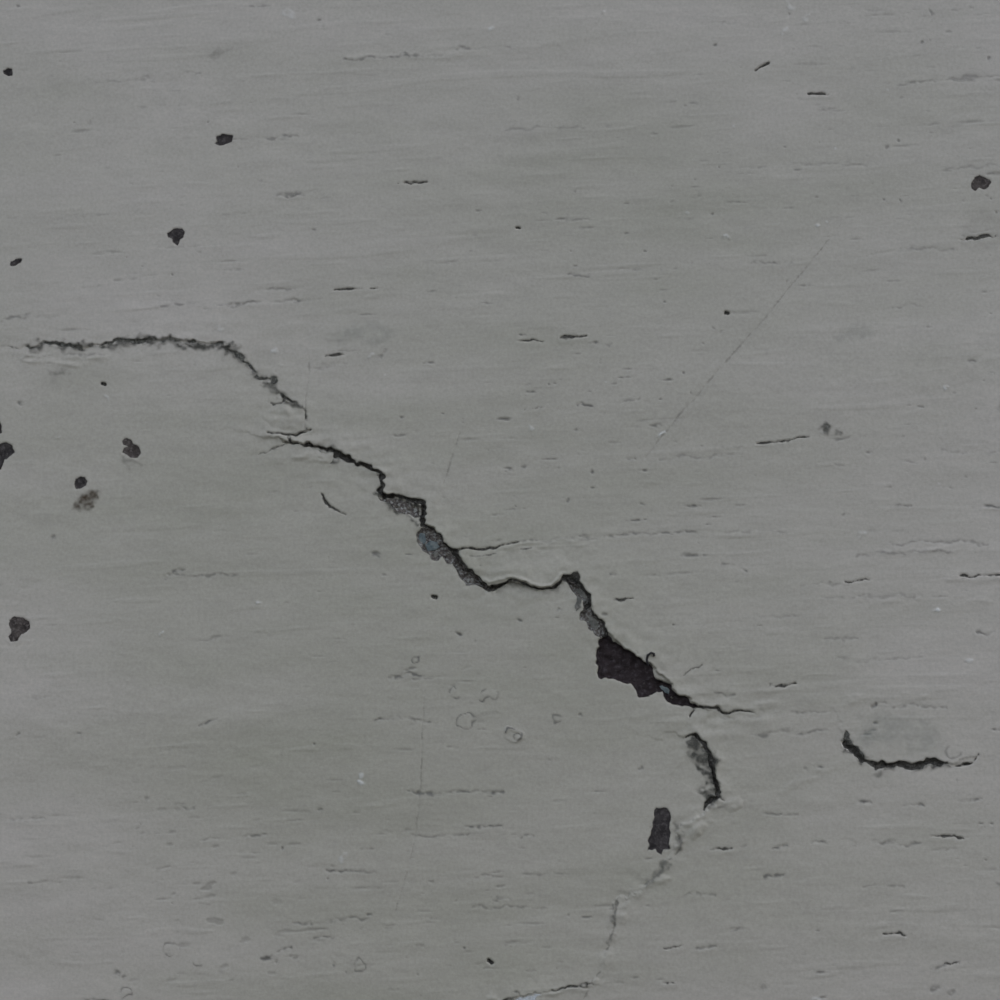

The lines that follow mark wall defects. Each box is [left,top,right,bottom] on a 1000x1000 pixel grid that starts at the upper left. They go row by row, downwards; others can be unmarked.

peeling [971,175,991,191]
peeling [167,228,185,245]
peeling [0,423,14,470]
peeling [123,438,141,458]
crack [27,335,751,811]
peeling [9,616,30,642]
crack [842,731,979,770]
peeling [648,807,671,854]